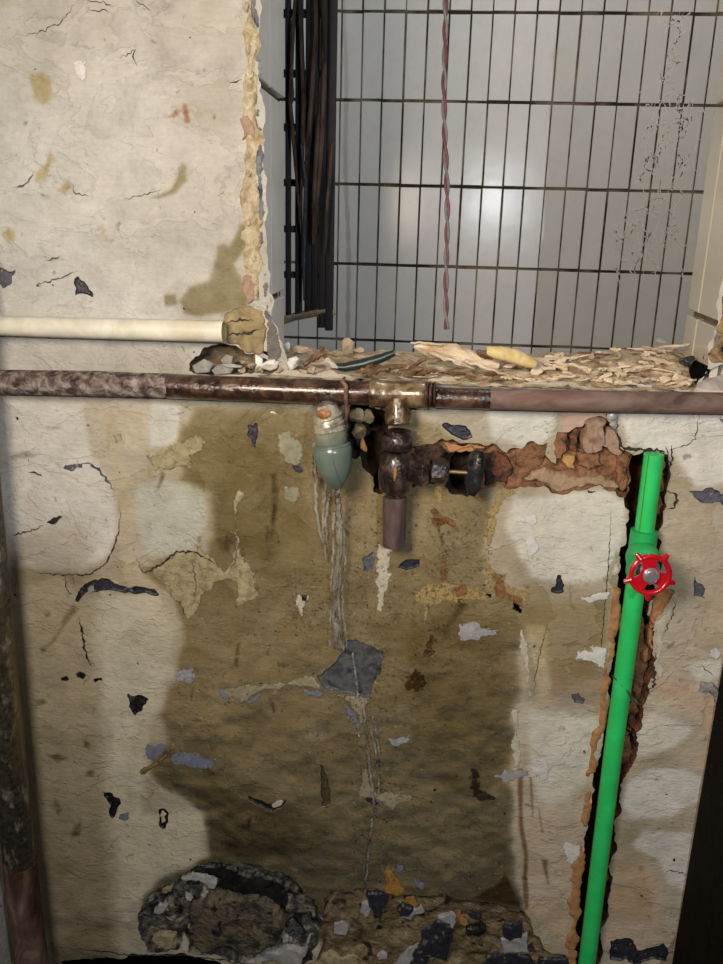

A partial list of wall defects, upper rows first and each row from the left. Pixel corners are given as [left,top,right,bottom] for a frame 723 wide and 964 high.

spalling [189,0,282,375]
spalling [689,297,723,385]
flaking render [409,416,632,499]
crack [32,462,121,592]
corrosion [431,485,457,582]
water stain [414,490,530,621]
crack [61,622,103,682]
flaking render [219,640,384,739]
flaking render [575,587,621,777]
water stain [470,768,496,801]
spalling [62,842,586,964]
flaking render [609,938,669,964]